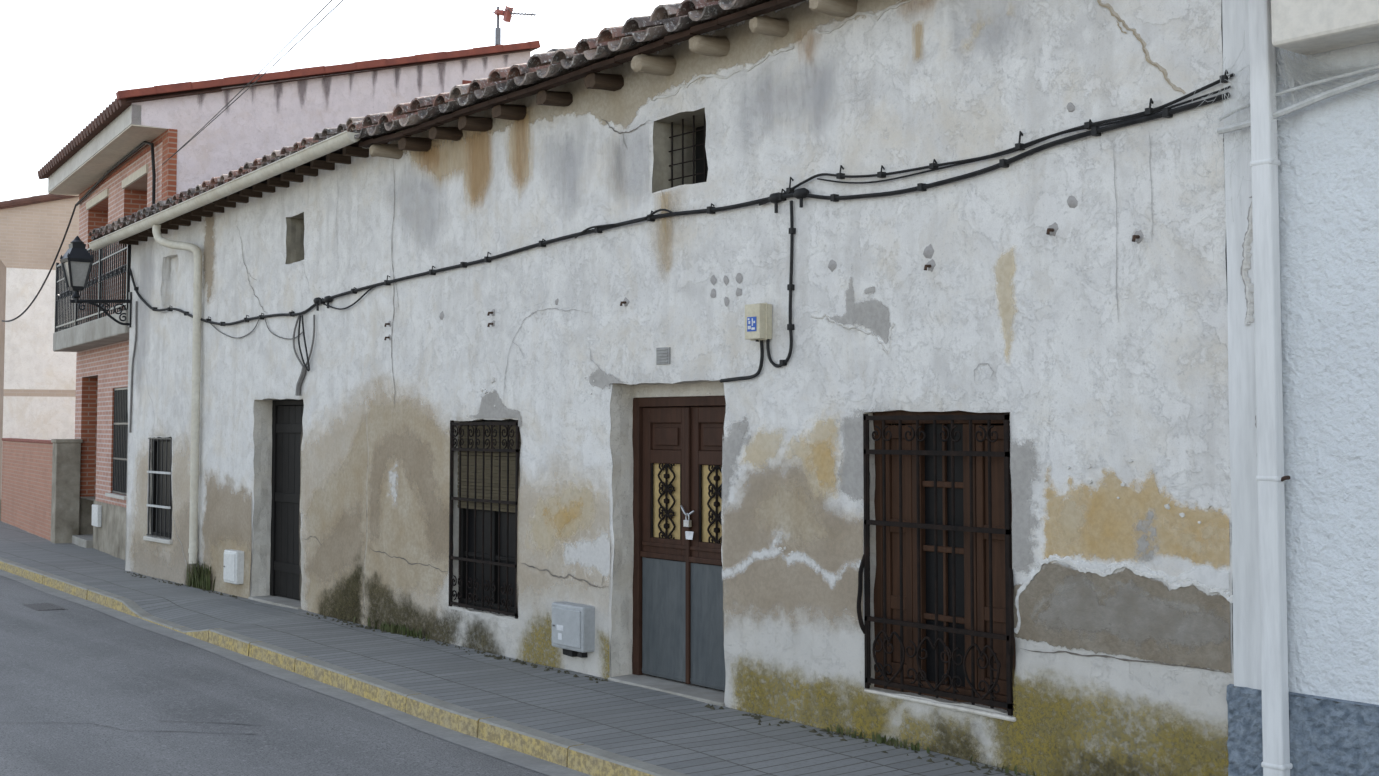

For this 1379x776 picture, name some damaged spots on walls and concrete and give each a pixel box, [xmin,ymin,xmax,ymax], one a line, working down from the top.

crack [1097,0,1186,94]
spalling [810,277,896,354]
spalling [470,377,521,427]
peeling [721,411,864,506]
damp [300,390,501,655]
damp [517,484,610,590]
spalling [1010,440,1233,673]